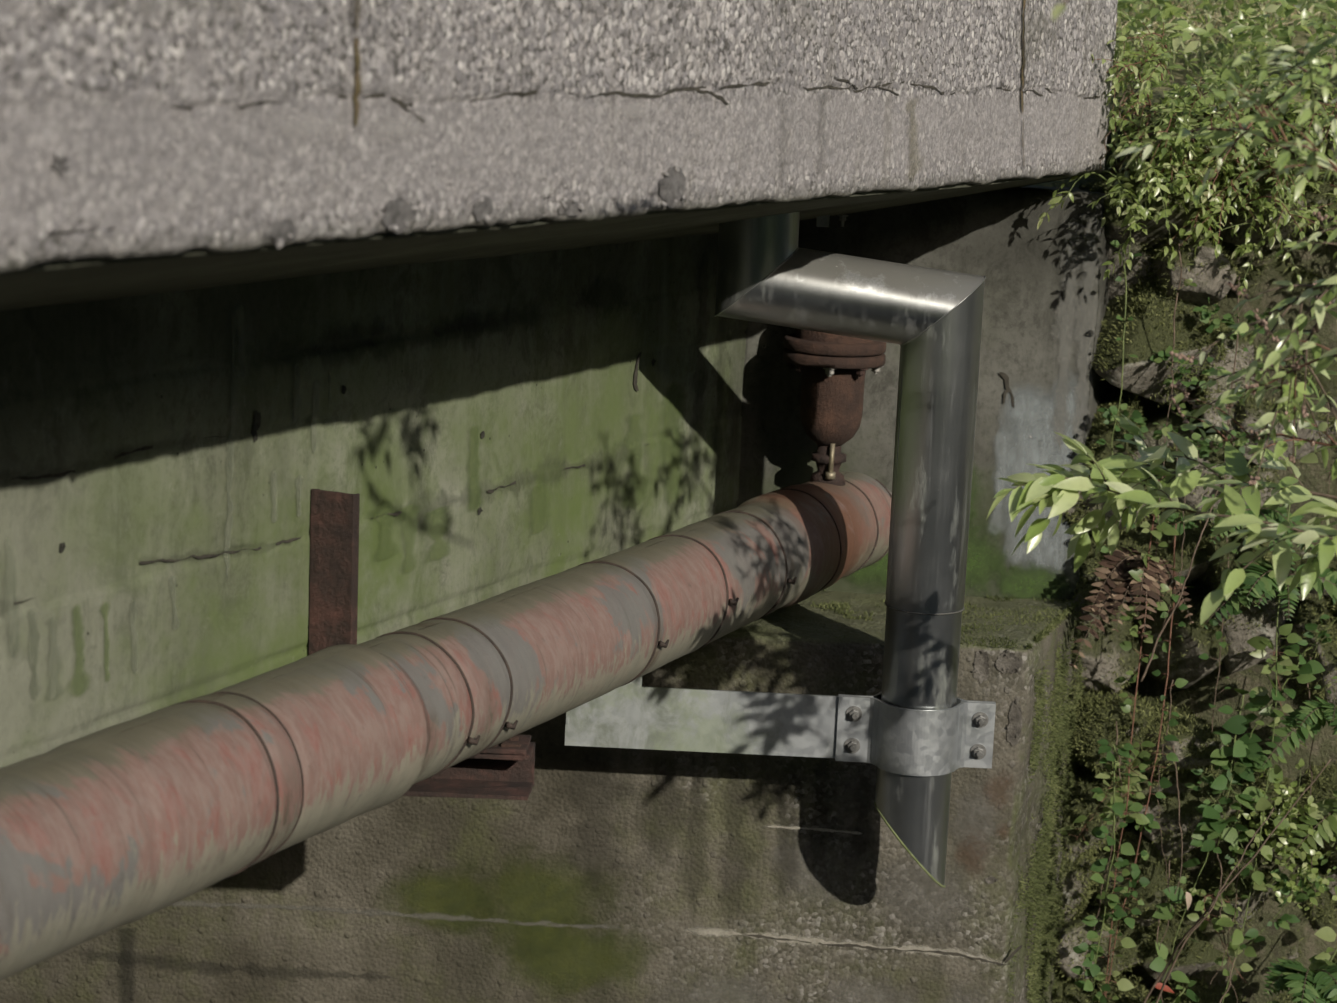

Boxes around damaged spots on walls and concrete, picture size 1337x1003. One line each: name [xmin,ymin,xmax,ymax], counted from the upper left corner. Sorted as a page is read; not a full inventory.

corrosion [353,0,361,126]
crack [171,104,193,112]
crack [239,100,280,109]
crack [338,93,425,123]
crack [471,82,770,105]
crack [804,77,955,95]
crack [996,87,1100,99]
spalling [659,164,686,208]
spalling [383,196,419,234]
crack [12,470,75,480]
crack [140,537,301,565]